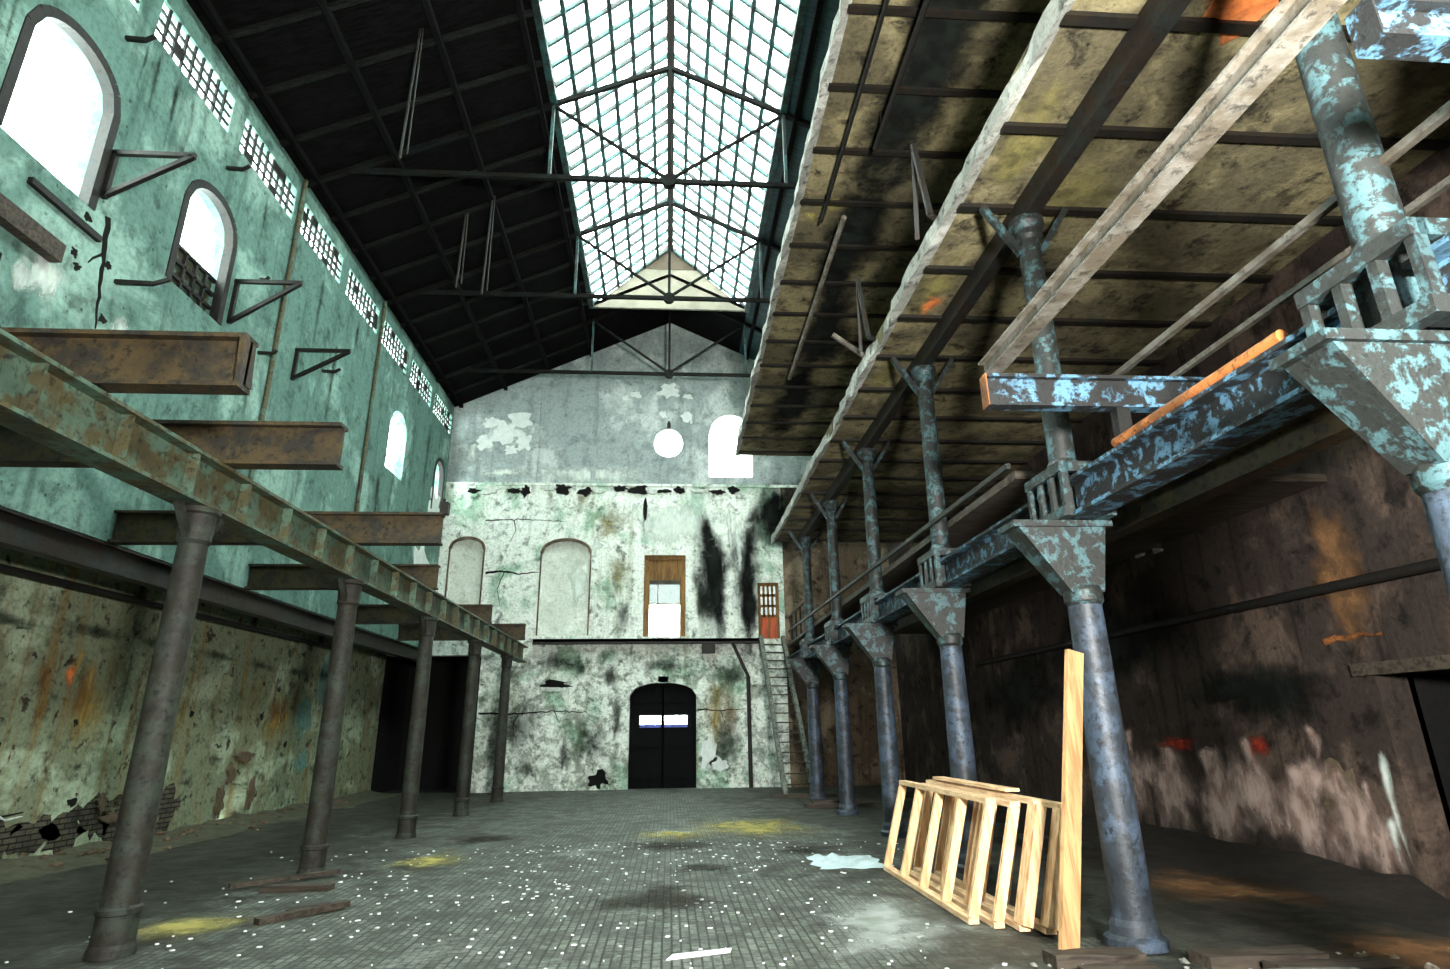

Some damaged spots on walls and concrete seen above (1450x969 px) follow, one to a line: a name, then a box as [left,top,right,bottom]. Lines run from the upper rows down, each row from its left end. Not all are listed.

corrosion [1203,0,1279,46]
peeling [476,412,533,455]
leakage [612,562,626,589]
leakage [638,489,796,645]
leakage [710,667,738,758]
crack [0,812,23,822]
spalling [0,792,121,860]
spalling [155,783,182,833]
leakage [1380,756,1400,846]